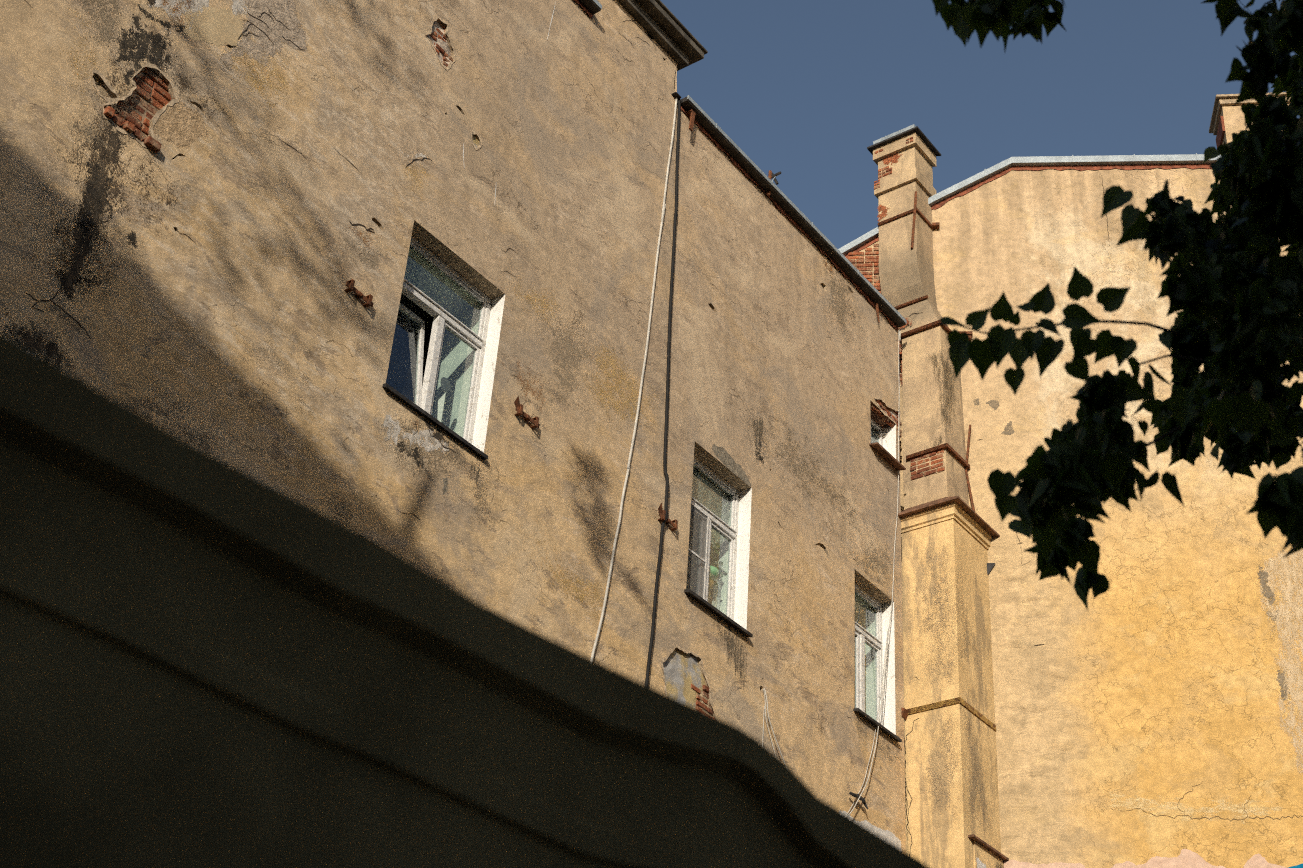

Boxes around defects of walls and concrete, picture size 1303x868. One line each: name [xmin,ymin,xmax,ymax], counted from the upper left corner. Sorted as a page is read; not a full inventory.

leakage [31,0,238,314]
spalling [92,62,209,160]
crack [25,289,92,341]
leakage [907,537,979,692]
spalling [661,645,717,718]
leakage [915,712,992,840]
crack [1109,781,1303,824]